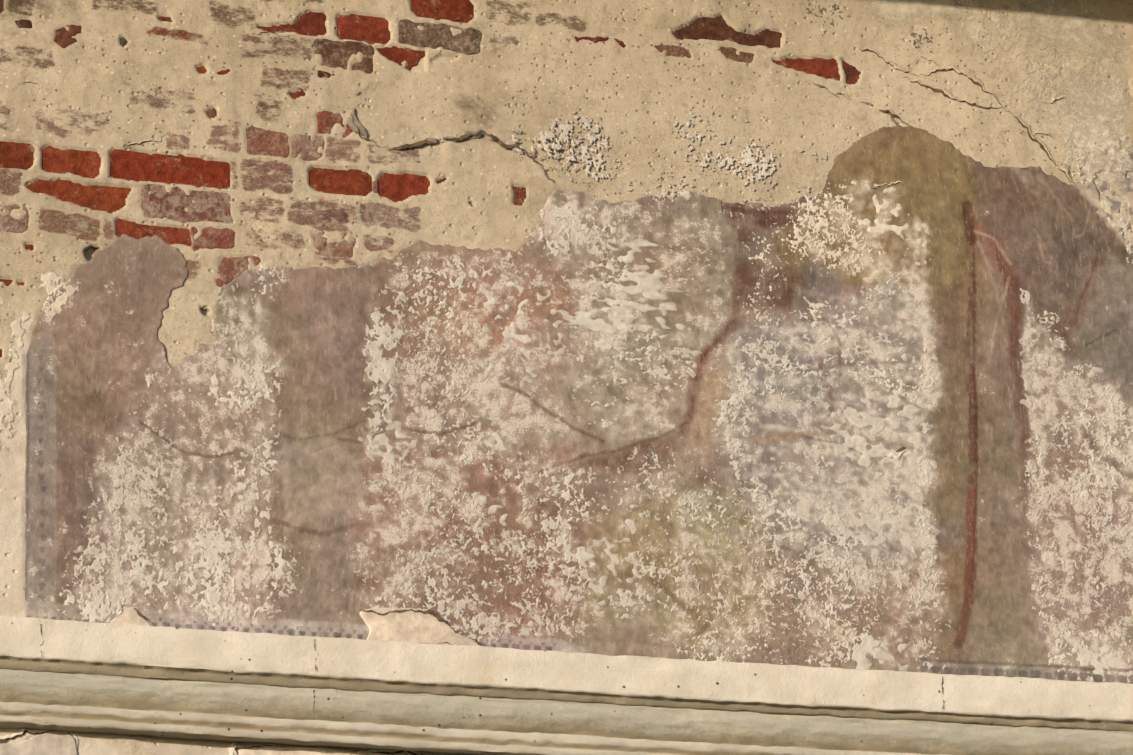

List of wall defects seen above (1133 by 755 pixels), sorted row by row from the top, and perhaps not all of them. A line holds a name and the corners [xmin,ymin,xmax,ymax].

crack [859,47,1078,184]
crack [1125,77,1133,107]
peeling [0,0,951,673]